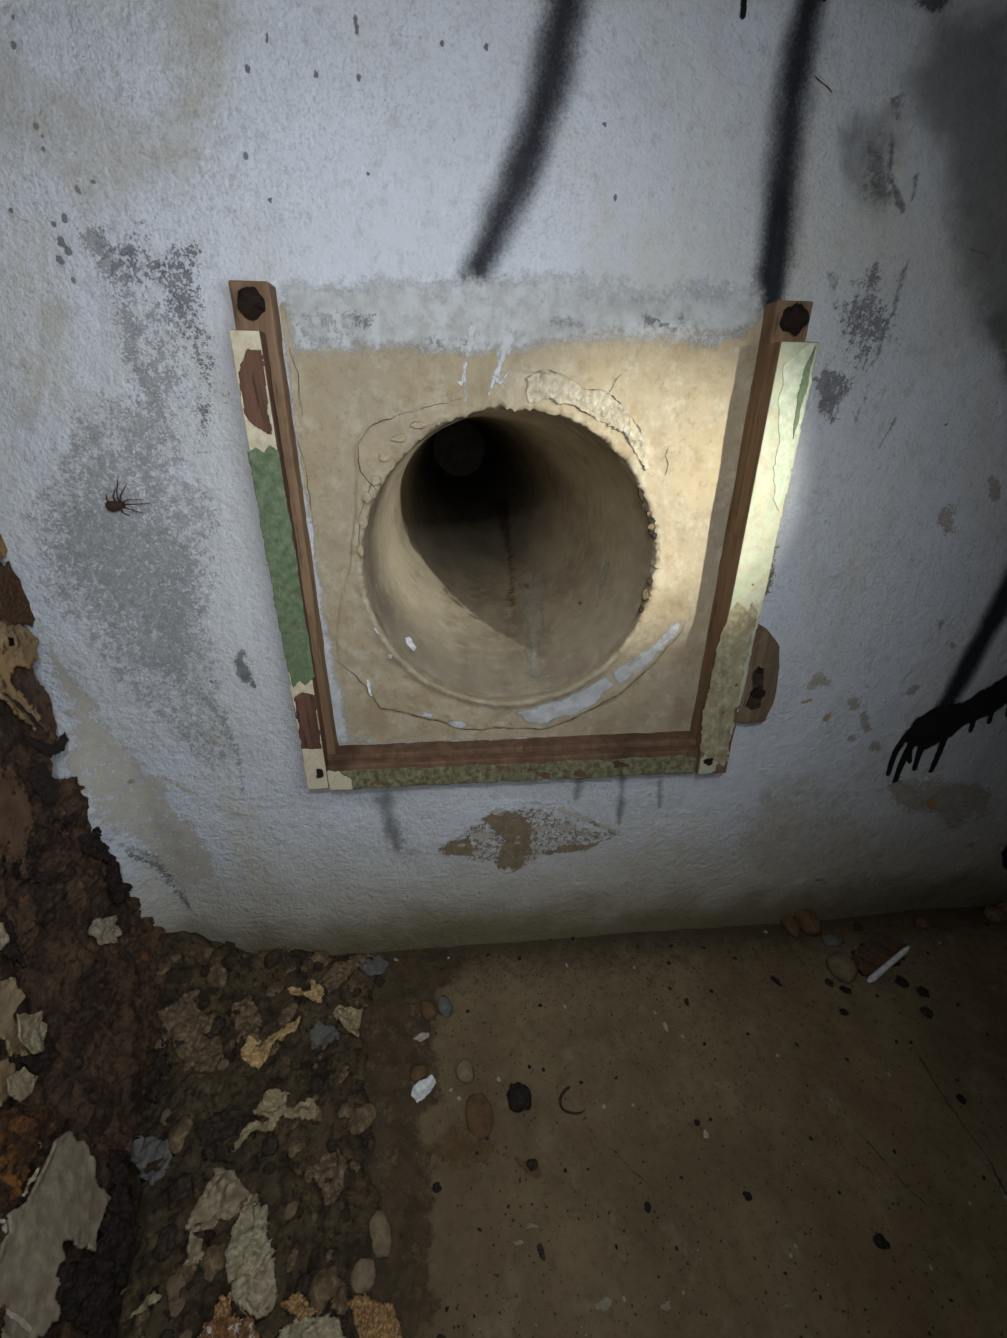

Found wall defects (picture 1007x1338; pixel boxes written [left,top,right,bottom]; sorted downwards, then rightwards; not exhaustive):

damp [869,144,918,212]
peeling [51,213,76,284]
damp [813,262,907,424]
damp [28,220,245,795]
damp [234,648,253,685]
peeling [0,534,133,950]
flaking render [437,802,617,871]
peeling [0,977,60,1107]
peeling [0,1131,112,1338]